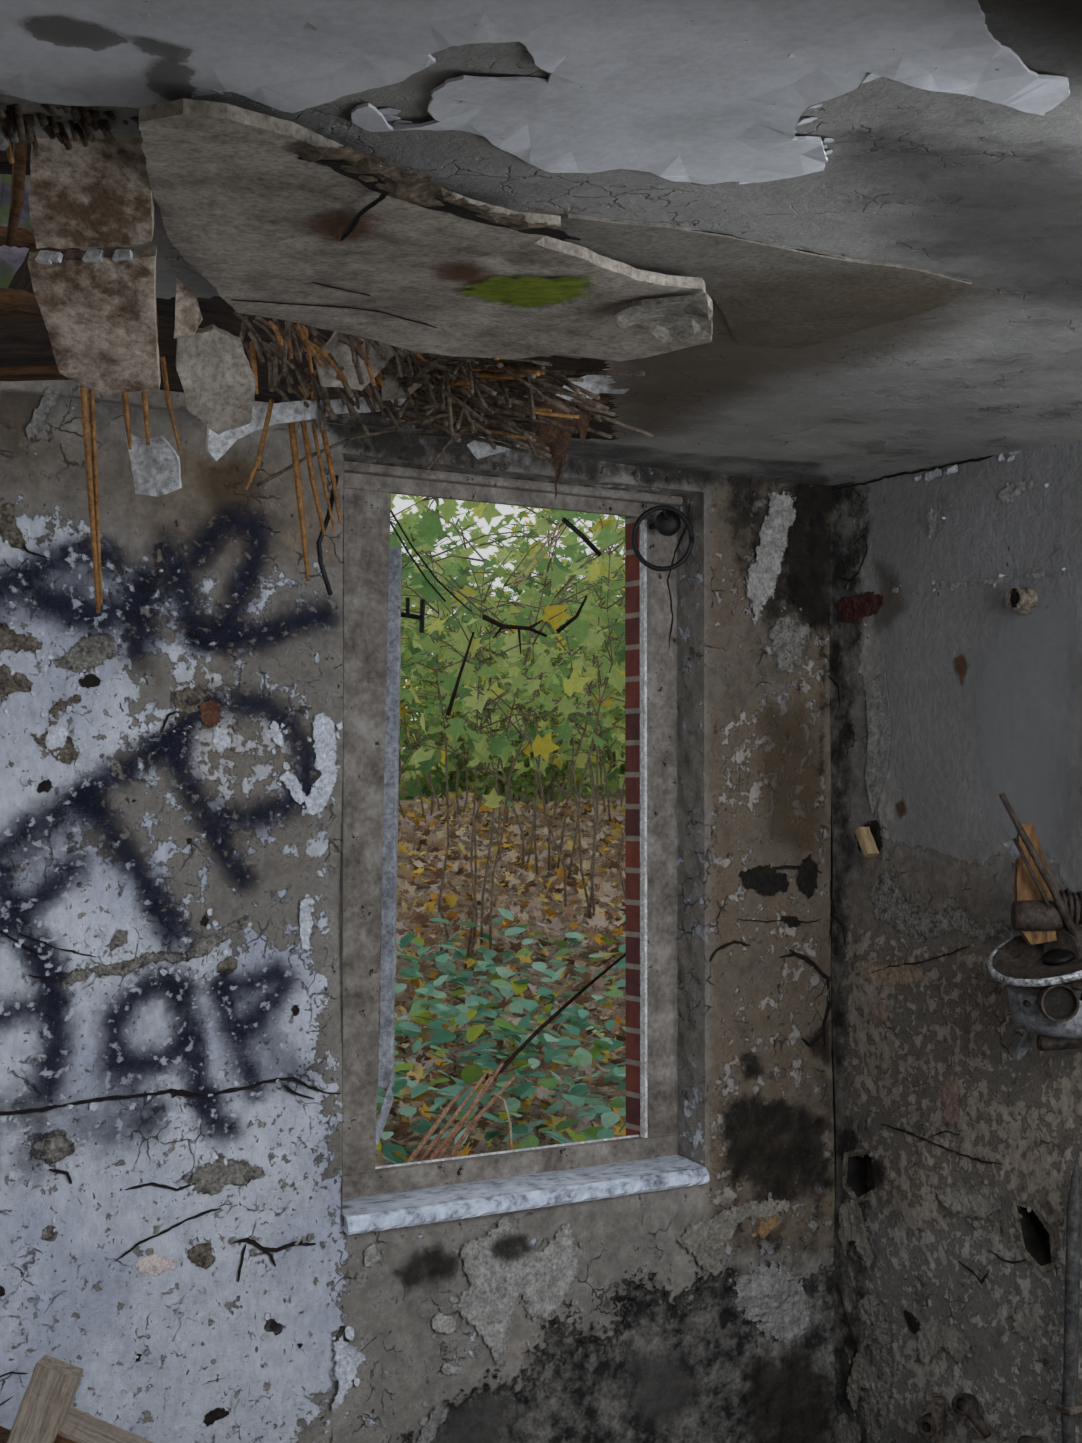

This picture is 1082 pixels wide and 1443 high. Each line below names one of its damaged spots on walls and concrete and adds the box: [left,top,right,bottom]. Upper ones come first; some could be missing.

peeling [0,0,1070,184]
flaking render [557,214,971,349]
water stain [781,485,832,640]
crack [828,675,840,707]
peeling [264,713,343,816]
crack [710,865,845,1069]
crack [0,1077,341,1121]
water stain [724,1099,833,1202]
crack [229,1233,316,1282]
water stain [493,1235,533,1259]
flaking render [398,1149,972,1443]
water stain [746,1349,832,1443]